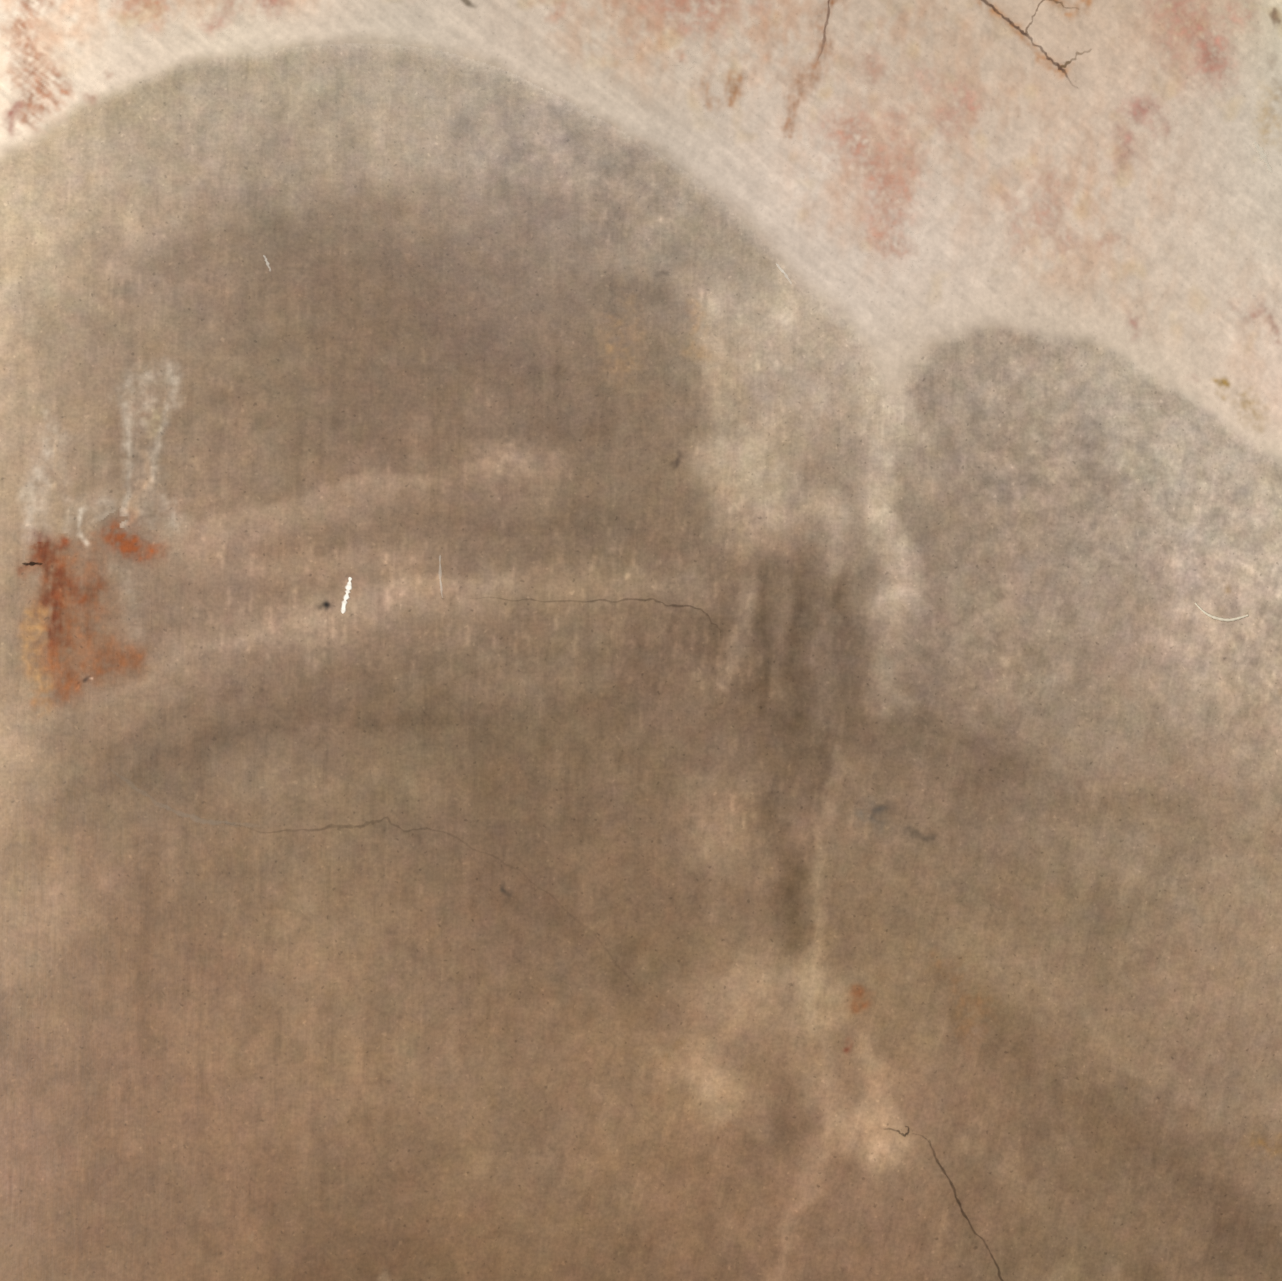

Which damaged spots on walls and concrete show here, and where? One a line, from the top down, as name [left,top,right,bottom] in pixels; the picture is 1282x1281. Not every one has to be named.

crack [774,0,846,145]
crack [966,0,1102,84]
rust [6,506,176,725]